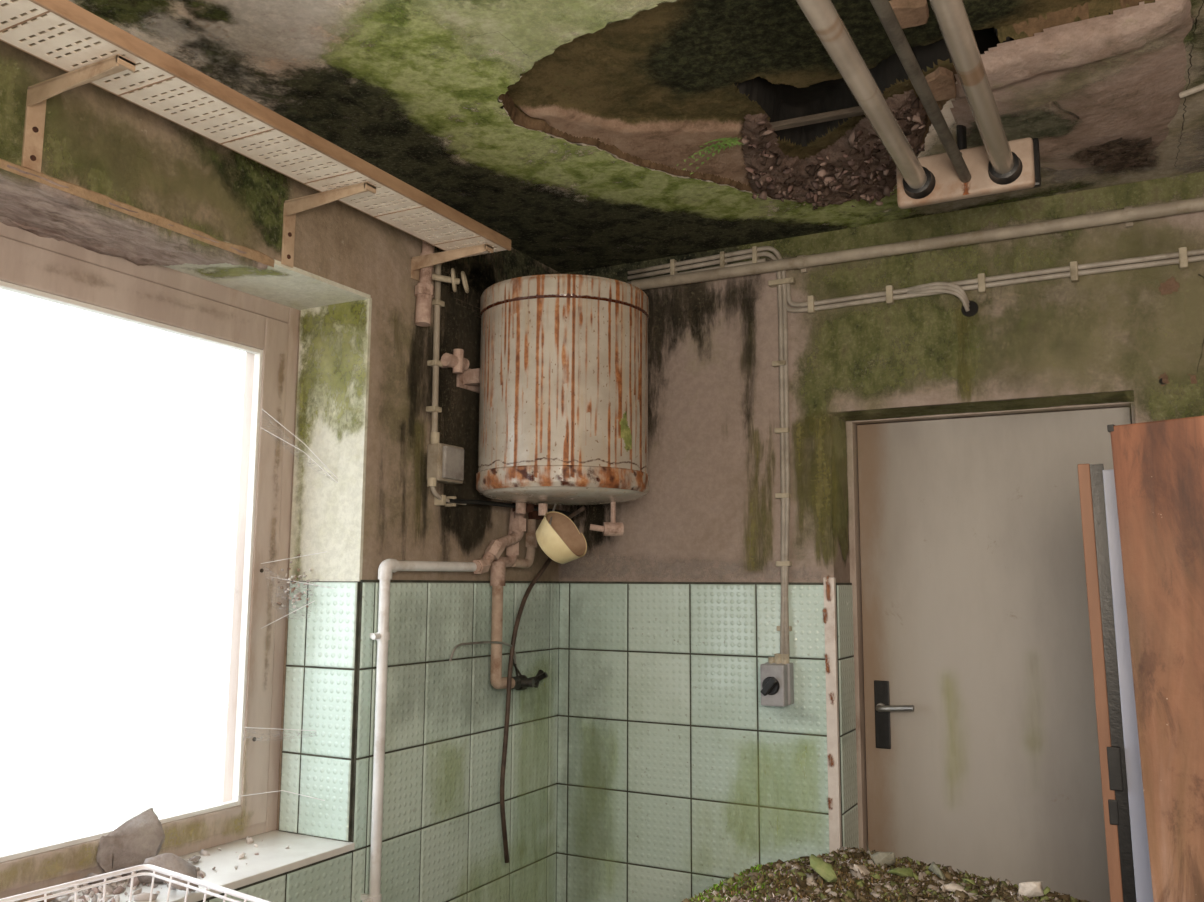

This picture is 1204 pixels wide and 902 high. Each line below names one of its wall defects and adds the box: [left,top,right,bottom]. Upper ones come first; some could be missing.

flaking render [498,0,897,210]
flaking render [831,0,957,157]
water stain [898,0,1204,220]
flaking render [963,0,1155,43]
water stain [44,0,846,564]
water stain [813,283,912,353]
water stain [924,229,1204,411]
water stain [563,433,777,578]